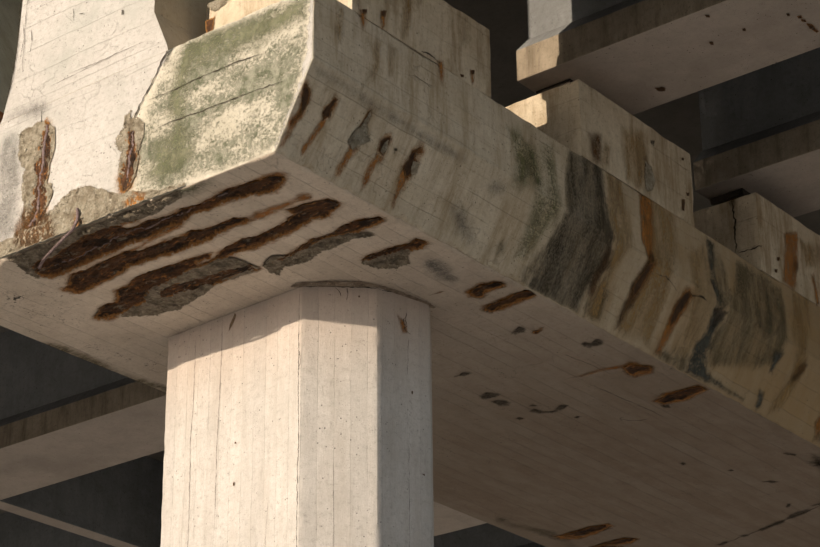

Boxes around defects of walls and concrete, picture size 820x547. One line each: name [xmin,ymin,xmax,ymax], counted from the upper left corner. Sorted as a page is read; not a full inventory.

rust [280,83,311,146]
rust [301,98,338,155]
rust [337,110,372,175]
spalling [0,48,385,321]
rust [393,146,424,208]
spalling [291,281,435,308]
spalling [362,238,427,269]
leakage [529,134,645,318]
leakage [620,201,674,341]
leakage [659,240,786,395]
crack [730,198,760,253]
crack [717,504,820,545]